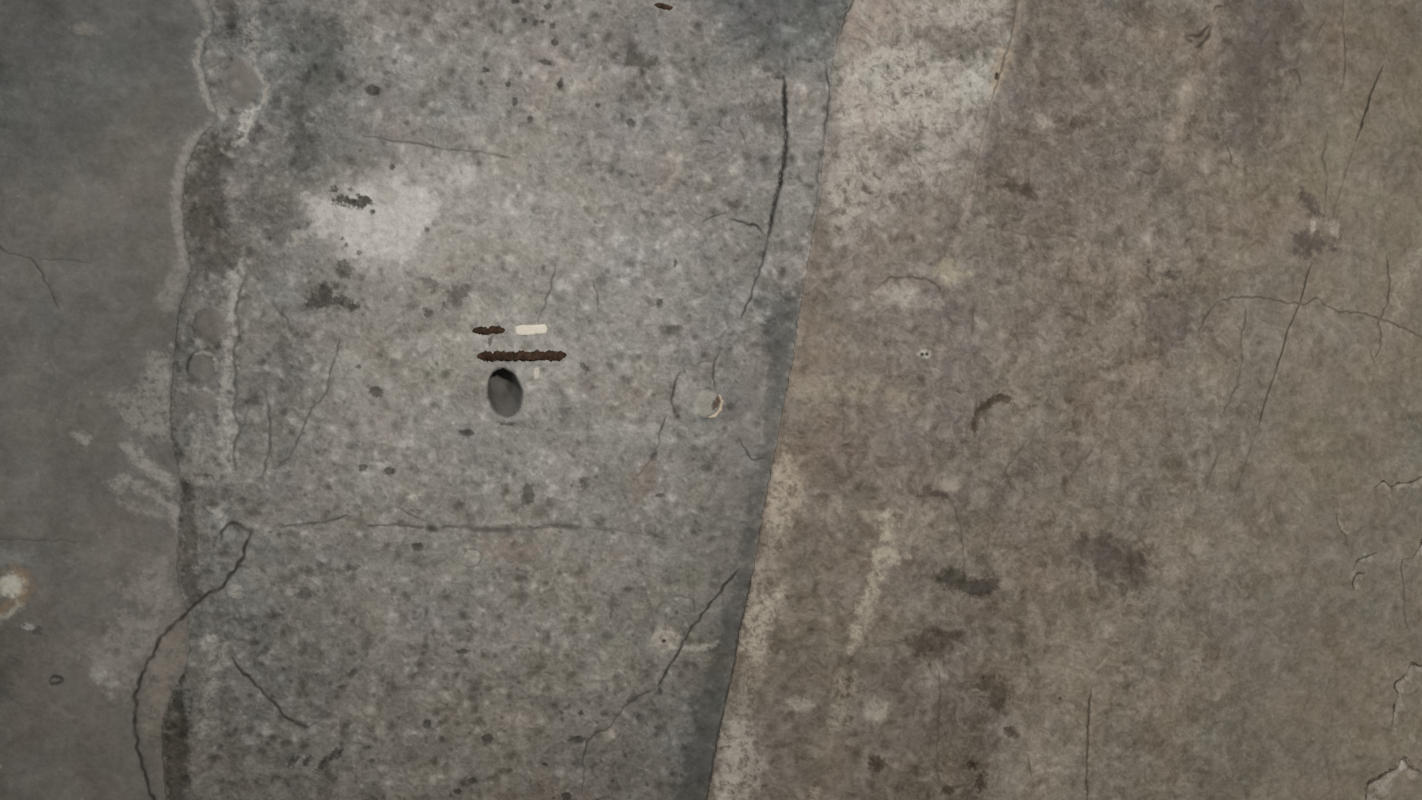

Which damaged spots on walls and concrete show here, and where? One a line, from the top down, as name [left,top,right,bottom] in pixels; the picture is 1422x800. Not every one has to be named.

crack [699,0,855,319]
crack [1314,0,1384,223]
crack [636,347,722,477]
crack [737,436,766,462]
crack [1197,254,1422,503]
damp [0,534,55,635]
crack [131,505,670,800]
crack [581,568,754,800]